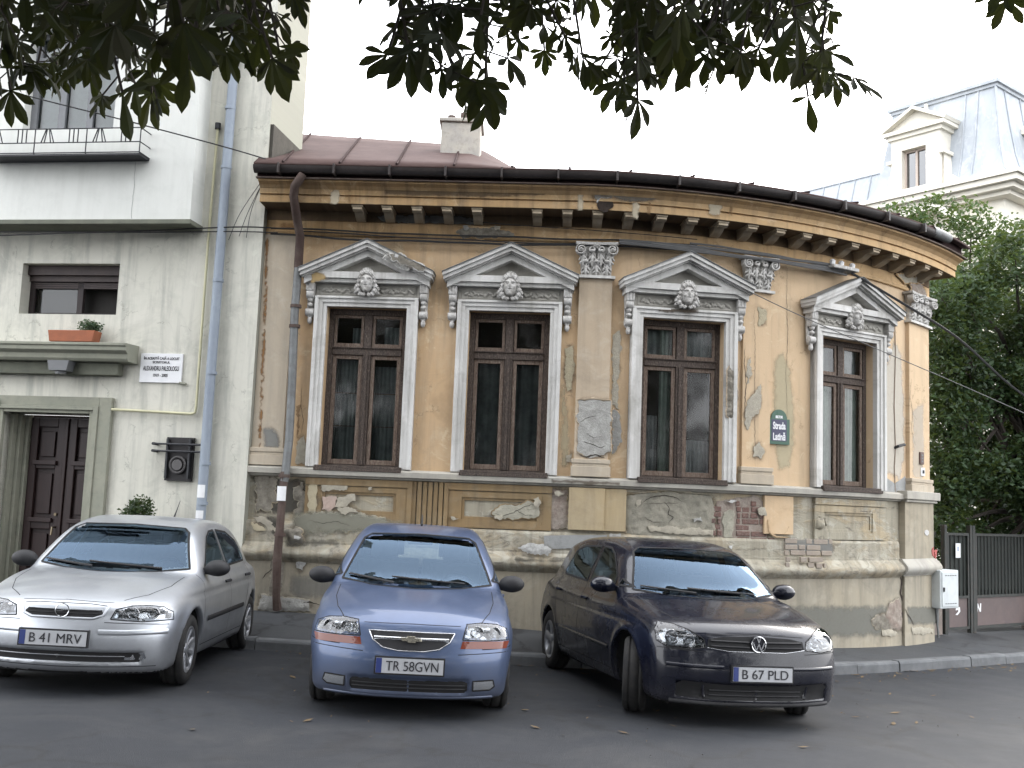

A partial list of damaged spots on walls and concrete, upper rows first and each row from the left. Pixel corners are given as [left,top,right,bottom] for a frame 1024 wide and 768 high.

spalling [564,330,623,462]
peeling [725,357,762,430]
spalling [251,516,338,546]
peeling [307,484,356,513]
spalling [625,490,833,568]